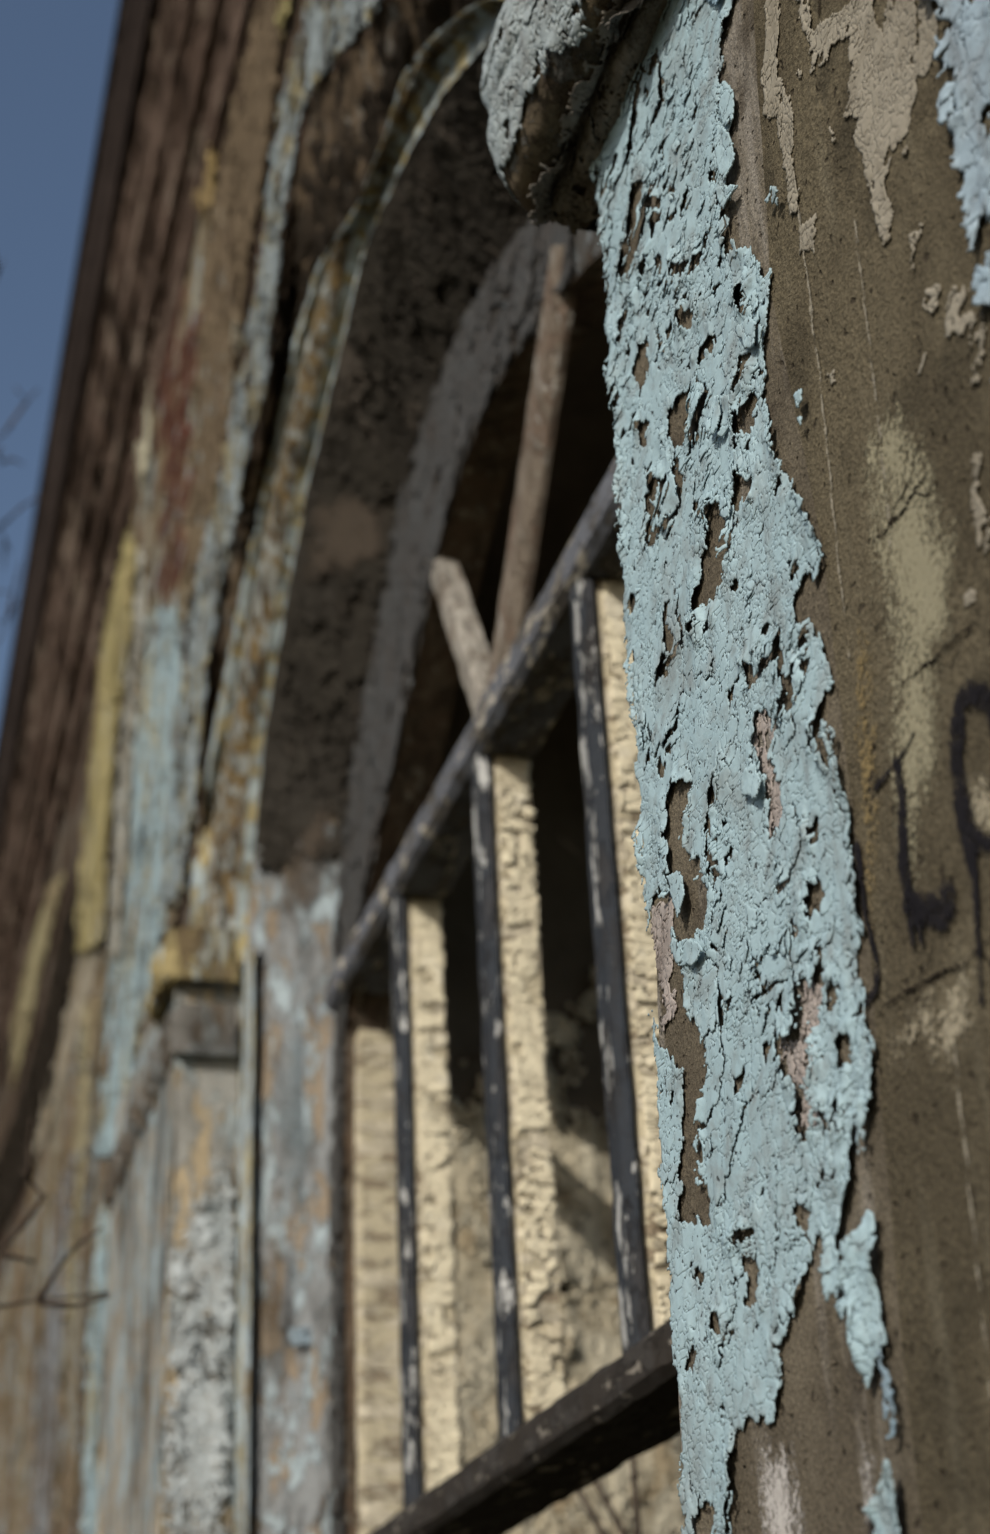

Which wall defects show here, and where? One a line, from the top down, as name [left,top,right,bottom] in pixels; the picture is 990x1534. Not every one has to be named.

peeling [149,0,875,1534]